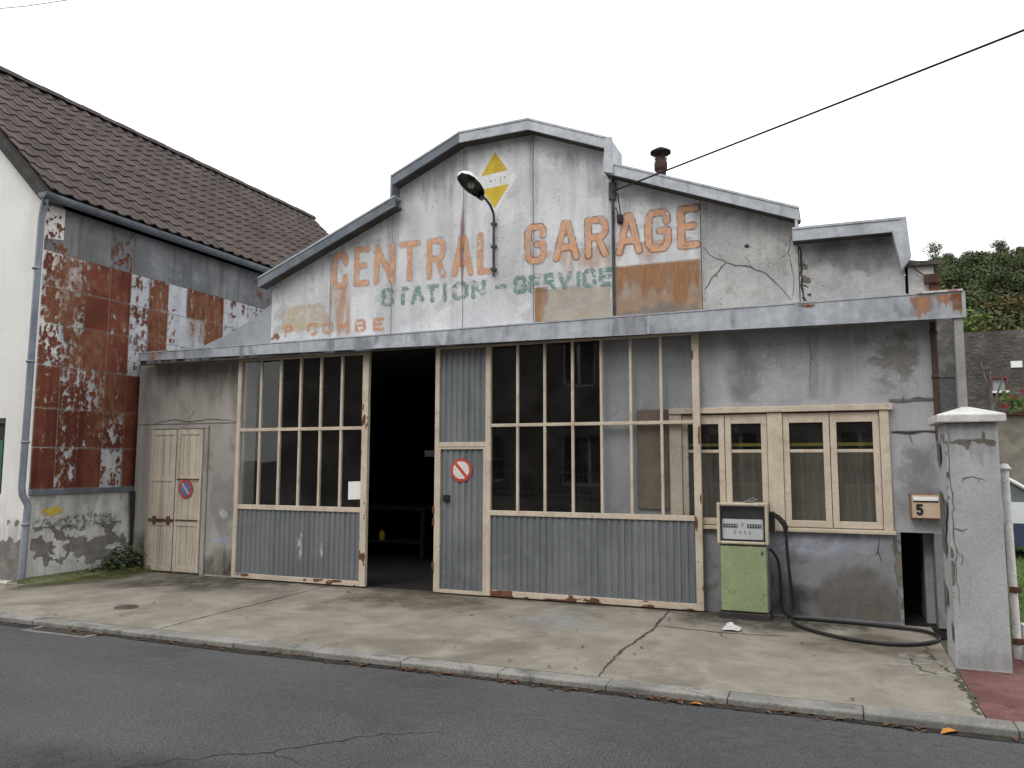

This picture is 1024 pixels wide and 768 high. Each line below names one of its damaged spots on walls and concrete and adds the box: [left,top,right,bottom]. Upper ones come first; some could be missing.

corrosion [616,242,702,316]
crack [705,236,809,302]
corrosion [910,293,962,318]
peeling [0,520,130,580]
crack [891,430,984,603]
spalling [921,430,996,614]